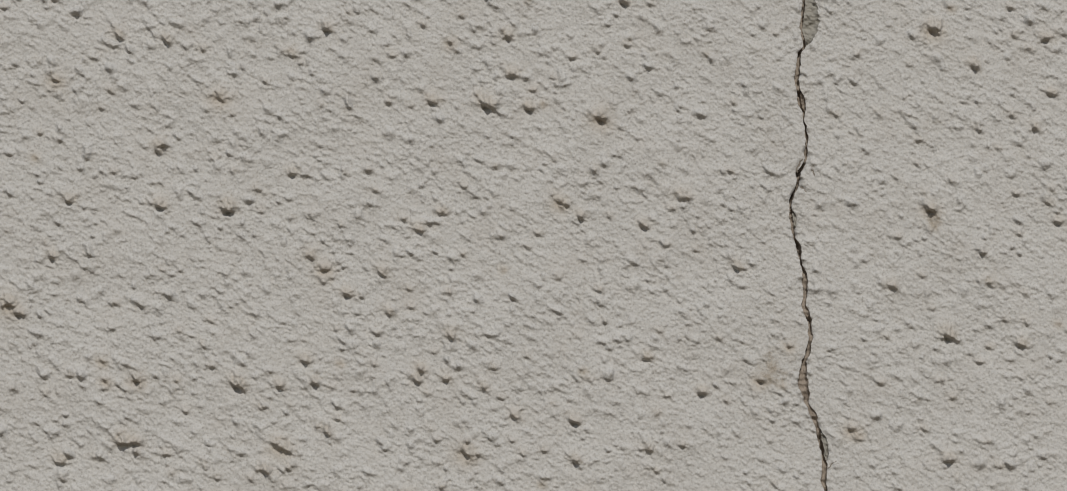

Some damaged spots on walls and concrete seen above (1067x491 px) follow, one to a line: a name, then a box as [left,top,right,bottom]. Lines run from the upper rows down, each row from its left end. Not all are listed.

crack [789,0,836,491]